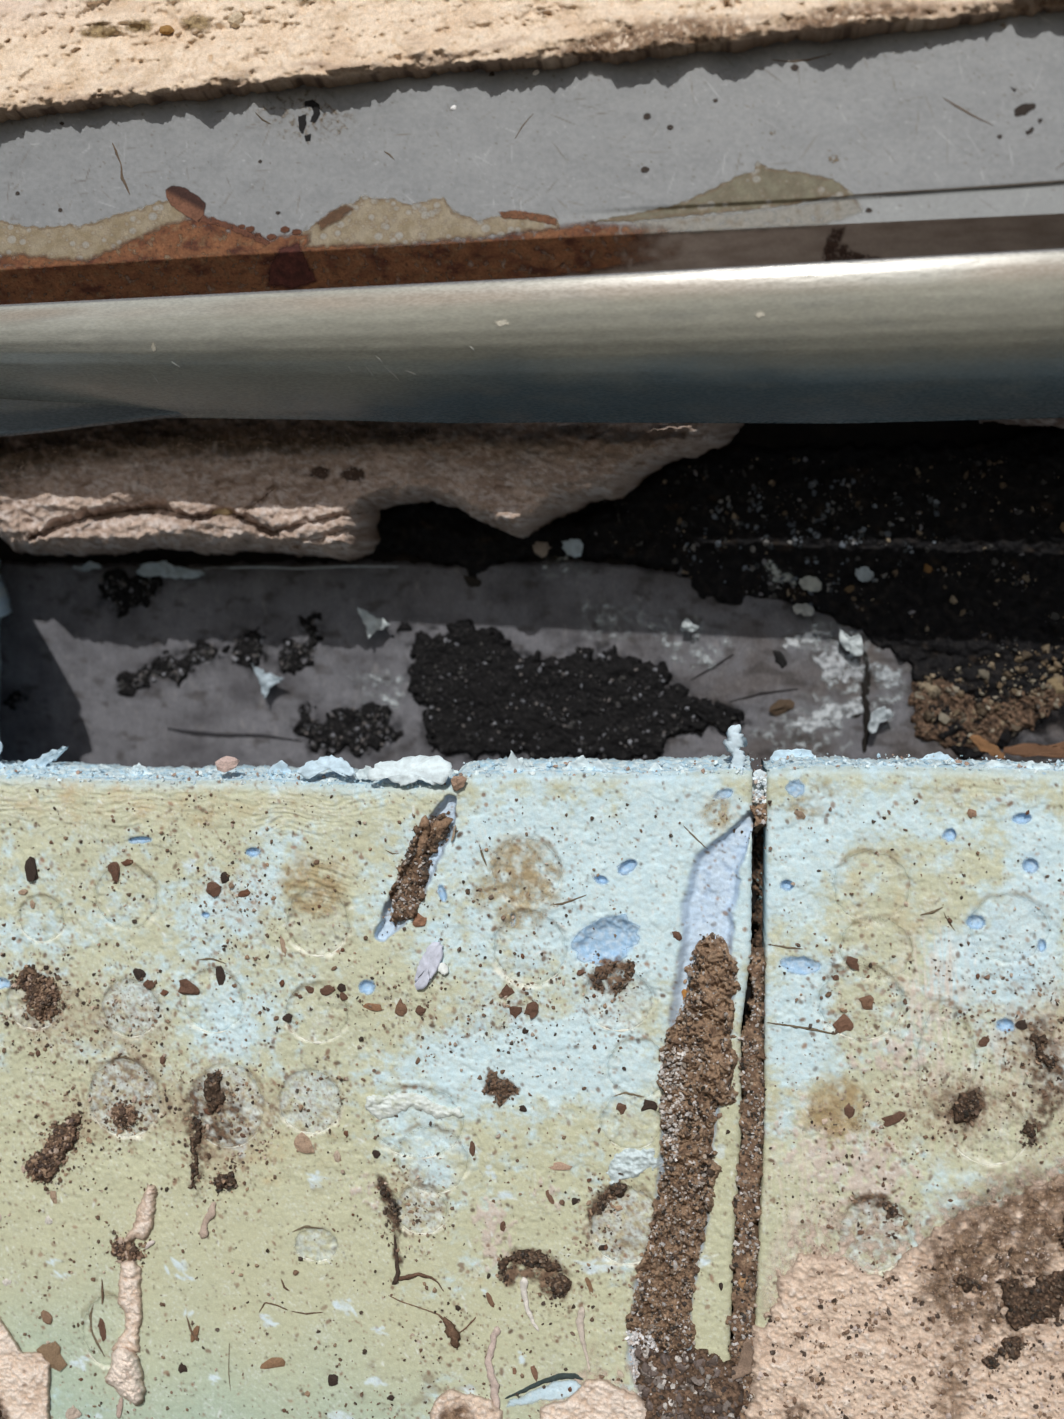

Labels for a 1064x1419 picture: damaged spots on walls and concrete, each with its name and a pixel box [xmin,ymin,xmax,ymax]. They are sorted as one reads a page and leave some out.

rust [0,186,652,305]
peeling [73,561,204,619]
peeling [792,576,822,616]
peeling [115,613,324,699]
peeling [839,628,863,656]
peeling [267,608,748,787]
peeling [868,706,893,734]
peeling [0,741,68,768]
peeling [770,749,814,761]
peeling [921,751,955,762]
peeling [984,760,1064,770]
crack [615,769,832,1419]